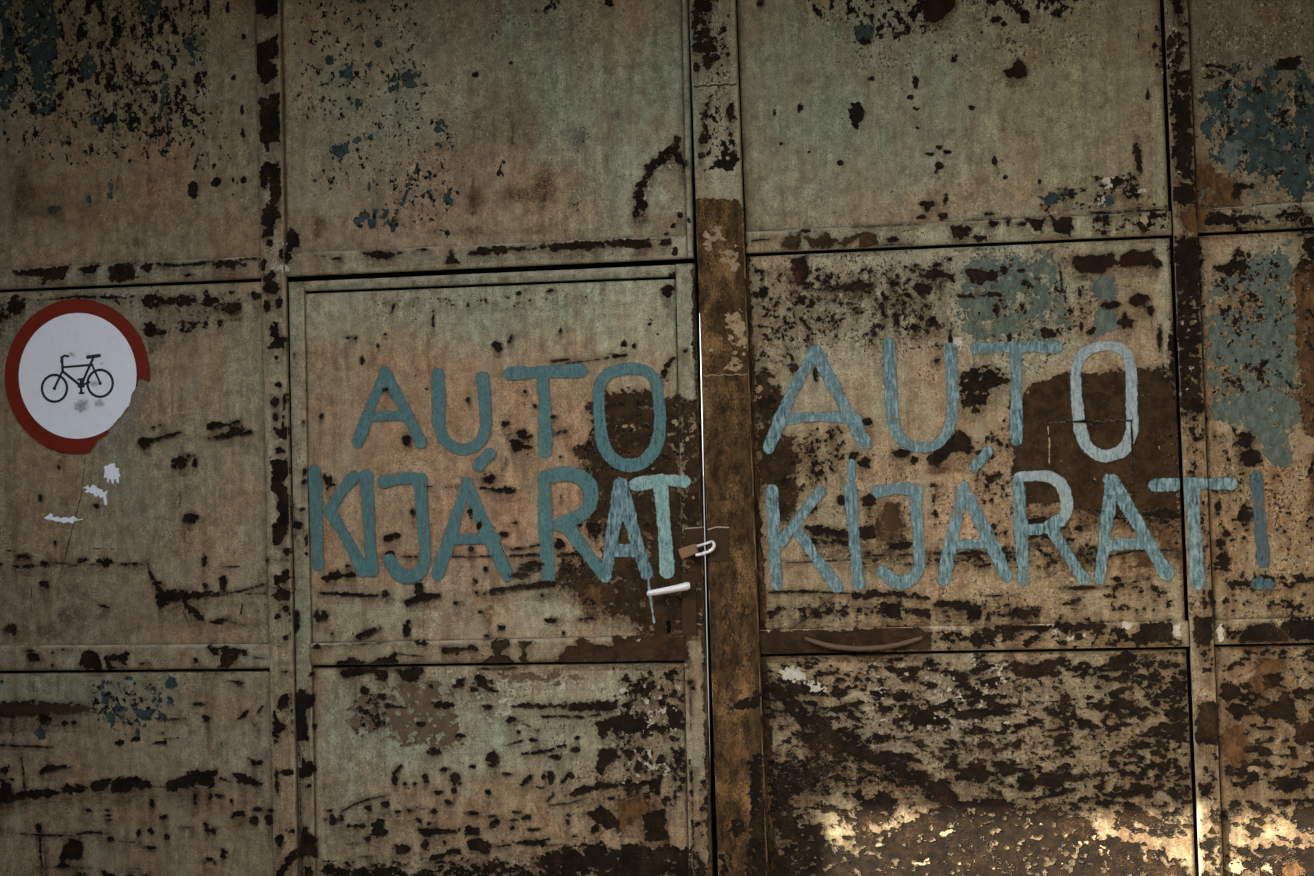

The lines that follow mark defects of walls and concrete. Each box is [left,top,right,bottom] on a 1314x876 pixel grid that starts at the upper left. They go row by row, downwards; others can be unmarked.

peeling [0,0,247,199]
corrosion [445,94,740,265]
corrosion [690,0,731,77]
peeling [808,0,930,46]
peeling [973,0,1084,34]
peeling [1197,55,1314,204]
corrosion [362,248,429,261]
corrosion [725,0,1314,876]
peeling [669,197,1120,876]
corrosion [0,381,729,876]
peeling [87,675,179,746]
peeling [345,667,619,786]